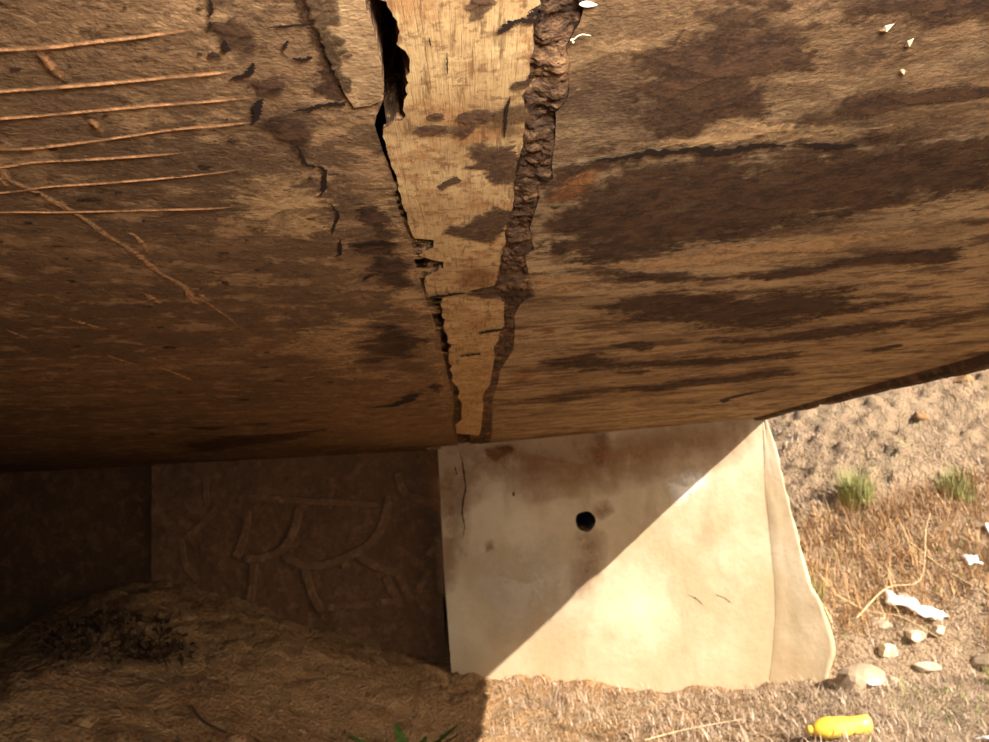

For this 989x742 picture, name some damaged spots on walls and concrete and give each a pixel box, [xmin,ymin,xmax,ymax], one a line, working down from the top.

damp [213,16,258,52]
damp [295,0,352,100]
crack [497,9,542,33]
damp [251,80,285,97]
crack [503,97,521,173]
crack [596,143,858,161]
damp [413,0,989,404]
damp [349,205,415,289]
crack [429,292,465,300]
damp [347,321,432,364]
crack [458,329,503,357]
crack [719,389,772,403]